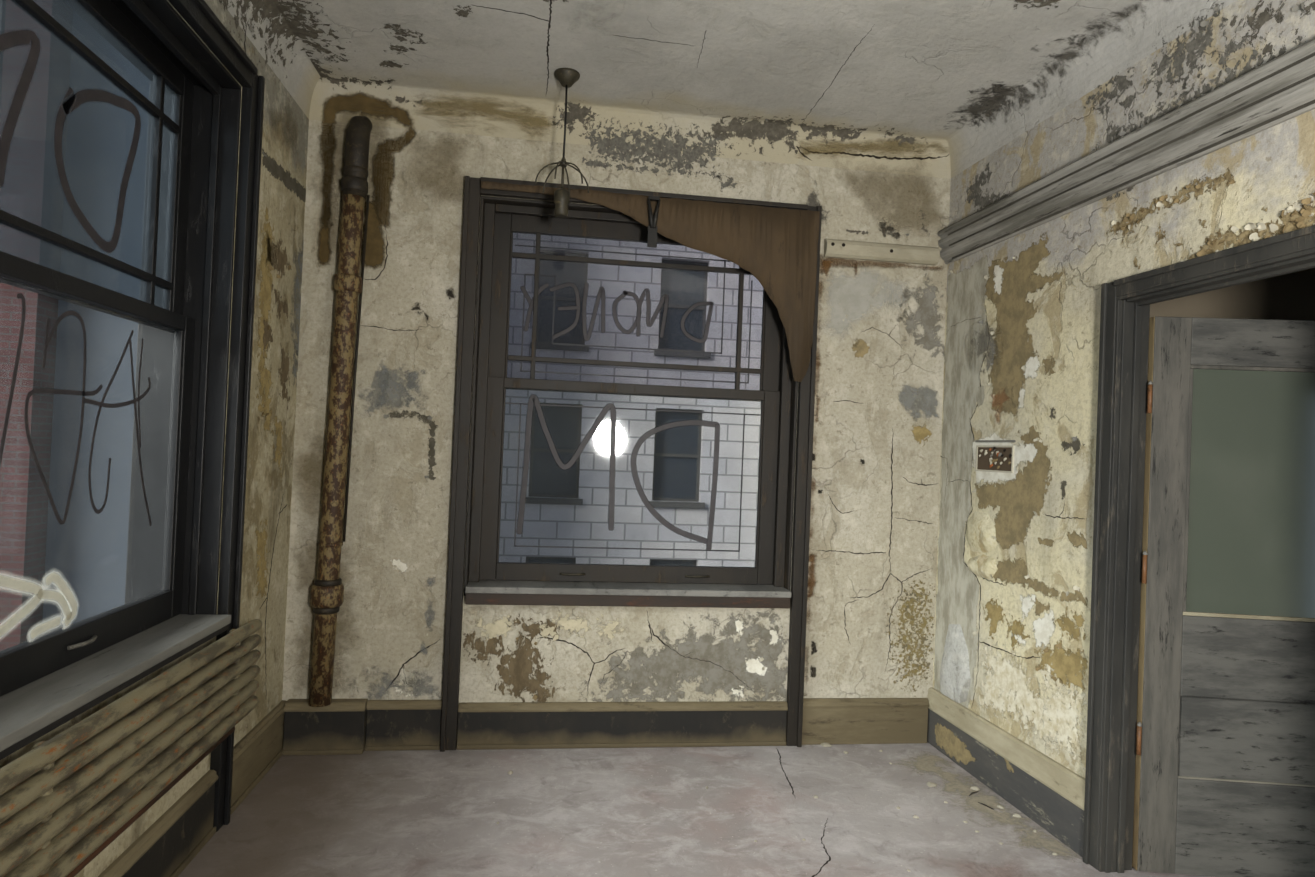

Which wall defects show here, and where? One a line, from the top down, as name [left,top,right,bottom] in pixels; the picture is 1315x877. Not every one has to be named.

crack [473,0,552,94]
peeling [1084,0,1315,151]
peeling [552,102,927,192]
peeling [1106,167,1315,269]
crack [816,306,1040,708]
peeling [897,232,1088,770]
peeling [461,611,625,702]
crack [537,611,757,697]
flaking render [579,608,789,702]
water stain [885,579,935,697]
crack [776,748,795,796]
crack [812,818,831,877]